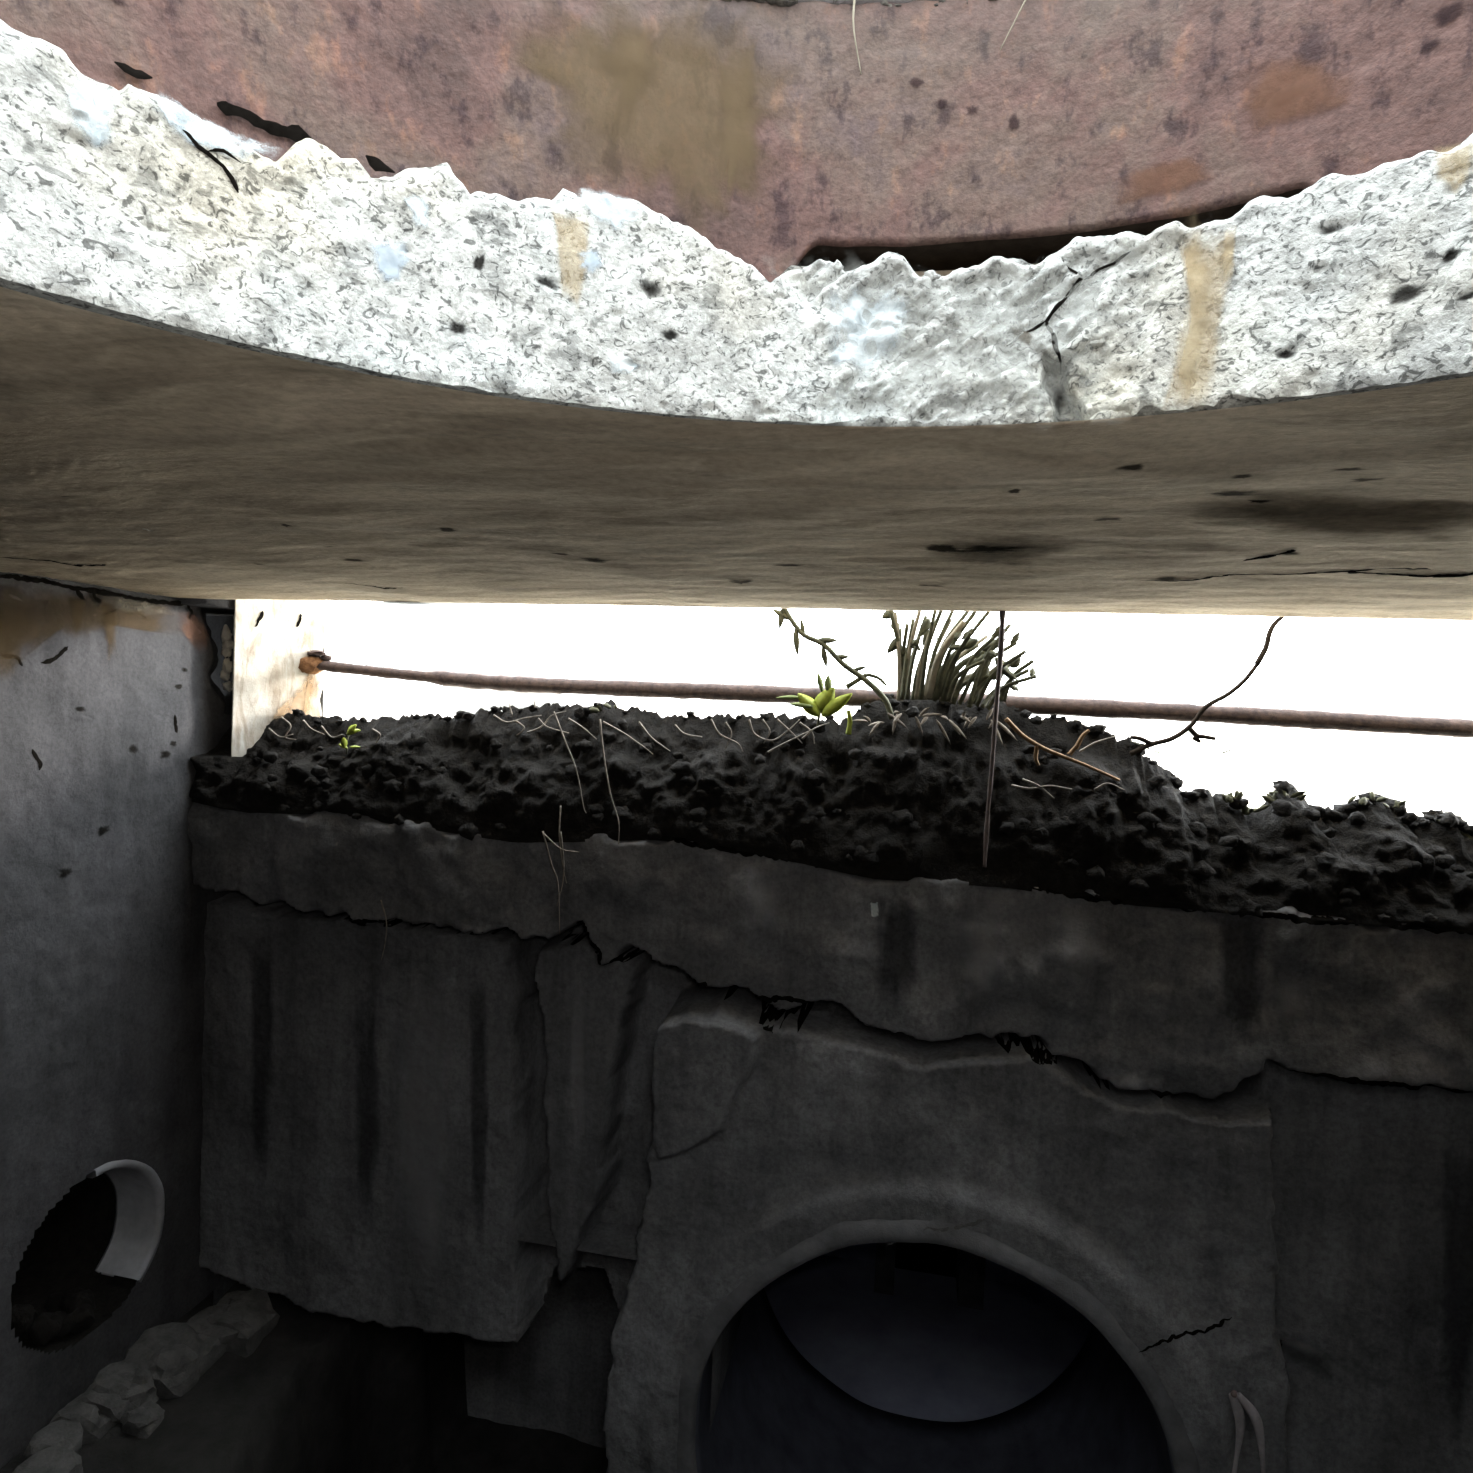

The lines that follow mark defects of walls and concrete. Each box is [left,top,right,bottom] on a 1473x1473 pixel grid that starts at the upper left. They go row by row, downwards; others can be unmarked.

corrosion [1421,2,1462,52]
peeling [158,99,263,153]
peeling [581,190,638,227]
spalling [474,255,484,269]
spalling [1443,247,1461,262]
spalling [642,281,659,297]
spalling [1391,285,1422,303]
spalling [450,321,466,333]
peeling [827,293,916,366]
crack [1007,251,1131,374]
crack [1147,549,1473,582]
crack [1138,1317,1232,1353]